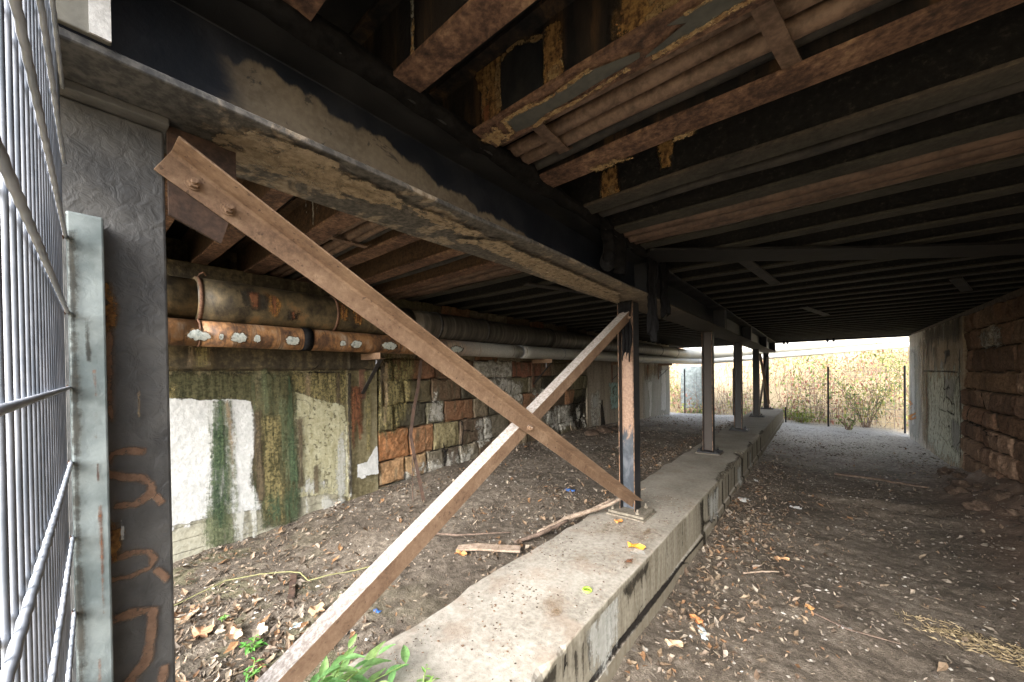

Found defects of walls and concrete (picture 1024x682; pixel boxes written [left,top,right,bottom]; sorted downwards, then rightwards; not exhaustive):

peeling [475,0,755,146]
peeling [211,130,621,303]
peeling [589,157,633,198]
peeling [657,131,695,169]
water stain [169,368,347,547]
water stain [543,665,556,682]
water stain [574,548,649,682]